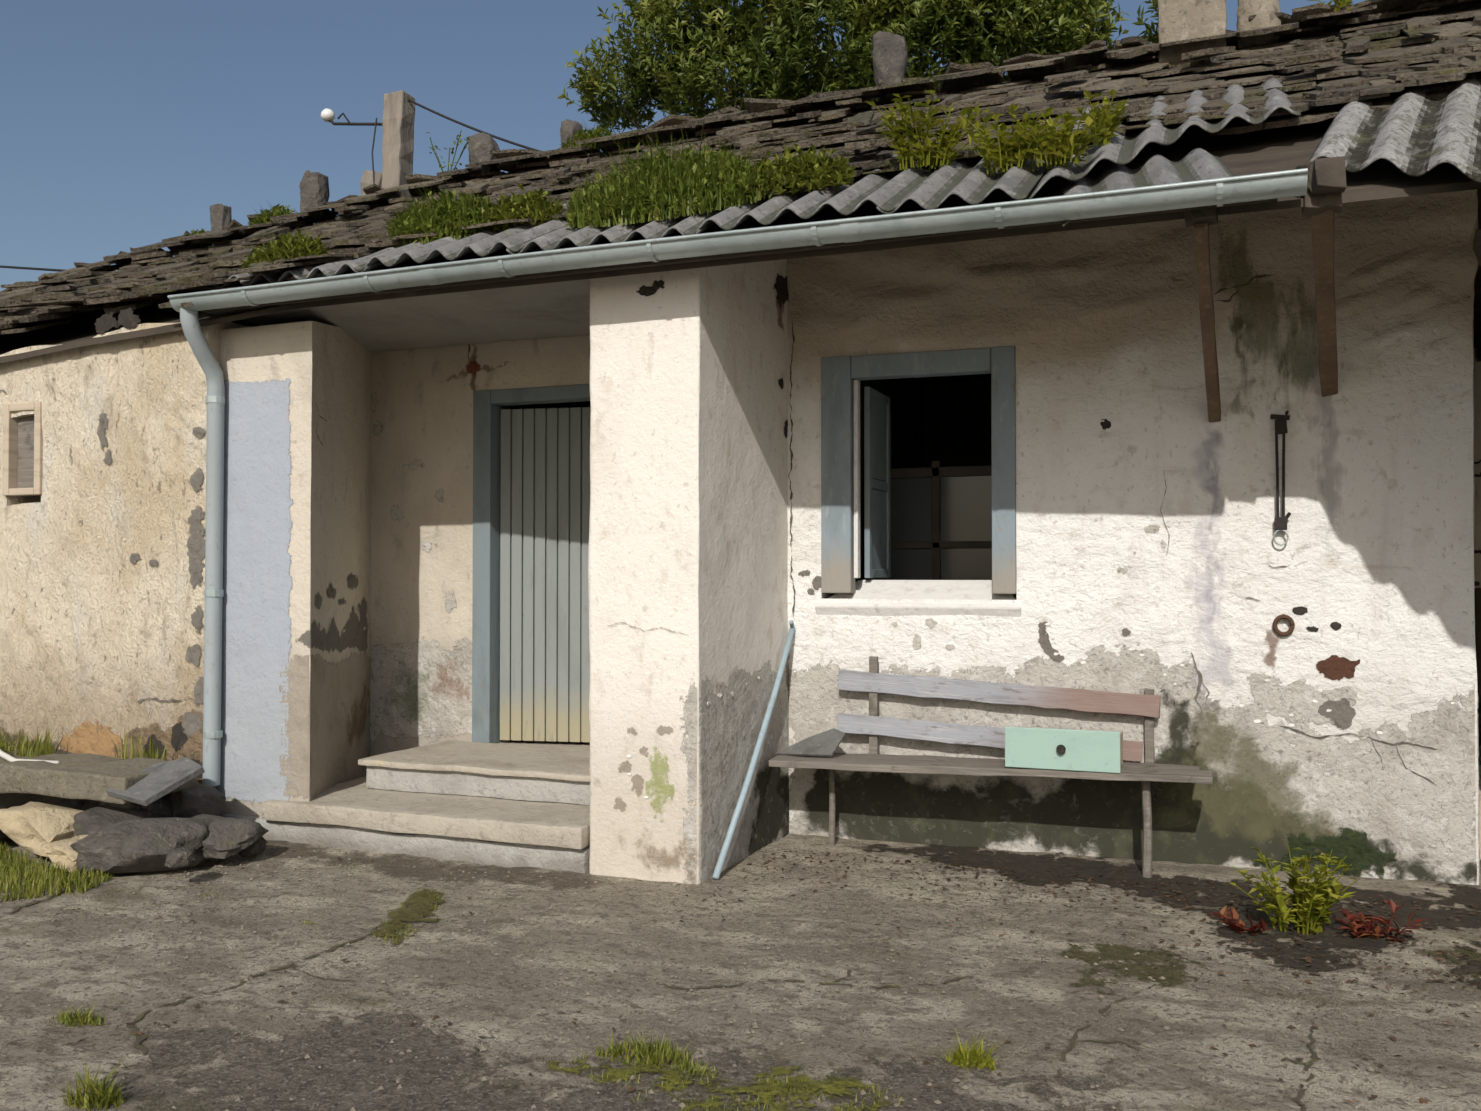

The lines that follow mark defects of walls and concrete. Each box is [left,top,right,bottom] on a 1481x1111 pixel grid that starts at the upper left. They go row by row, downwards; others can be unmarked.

corrosion [449,347,491,390]
peeling [279,573,472,800]
leakage [749,690,1343,873]
peeling [613,619,1480,885]
crack [1279,725,1437,785]
leakage [1367,839,1477,883]